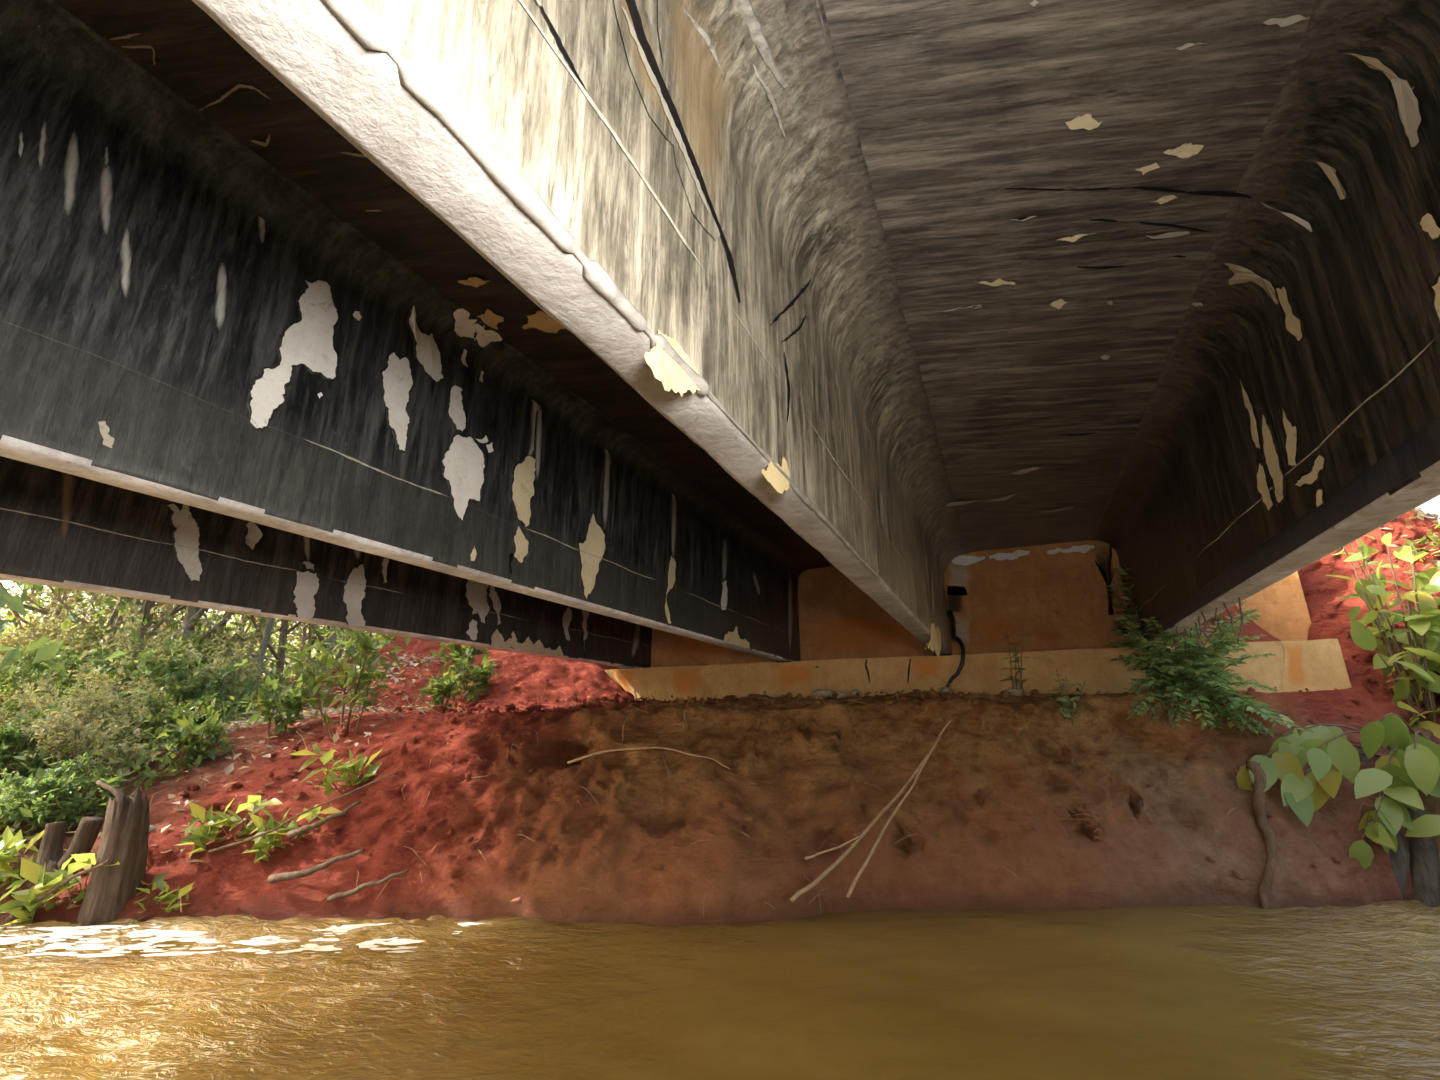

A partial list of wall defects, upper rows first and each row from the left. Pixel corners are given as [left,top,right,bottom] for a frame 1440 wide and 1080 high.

crack [537,0,587,92]
crack [621,0,741,303]
peeling [1346,53,1421,147]
peeling [246,277,363,430]
peeling [380,303,494,522]
spalling [644,329,699,396]
crack [770,280,811,421]
peeling [1240,380,1326,511]
peeling [164,503,203,583]
peeling [292,562,321,619]
peeling [509,455,536,574]
peeling [465,511,606,660]